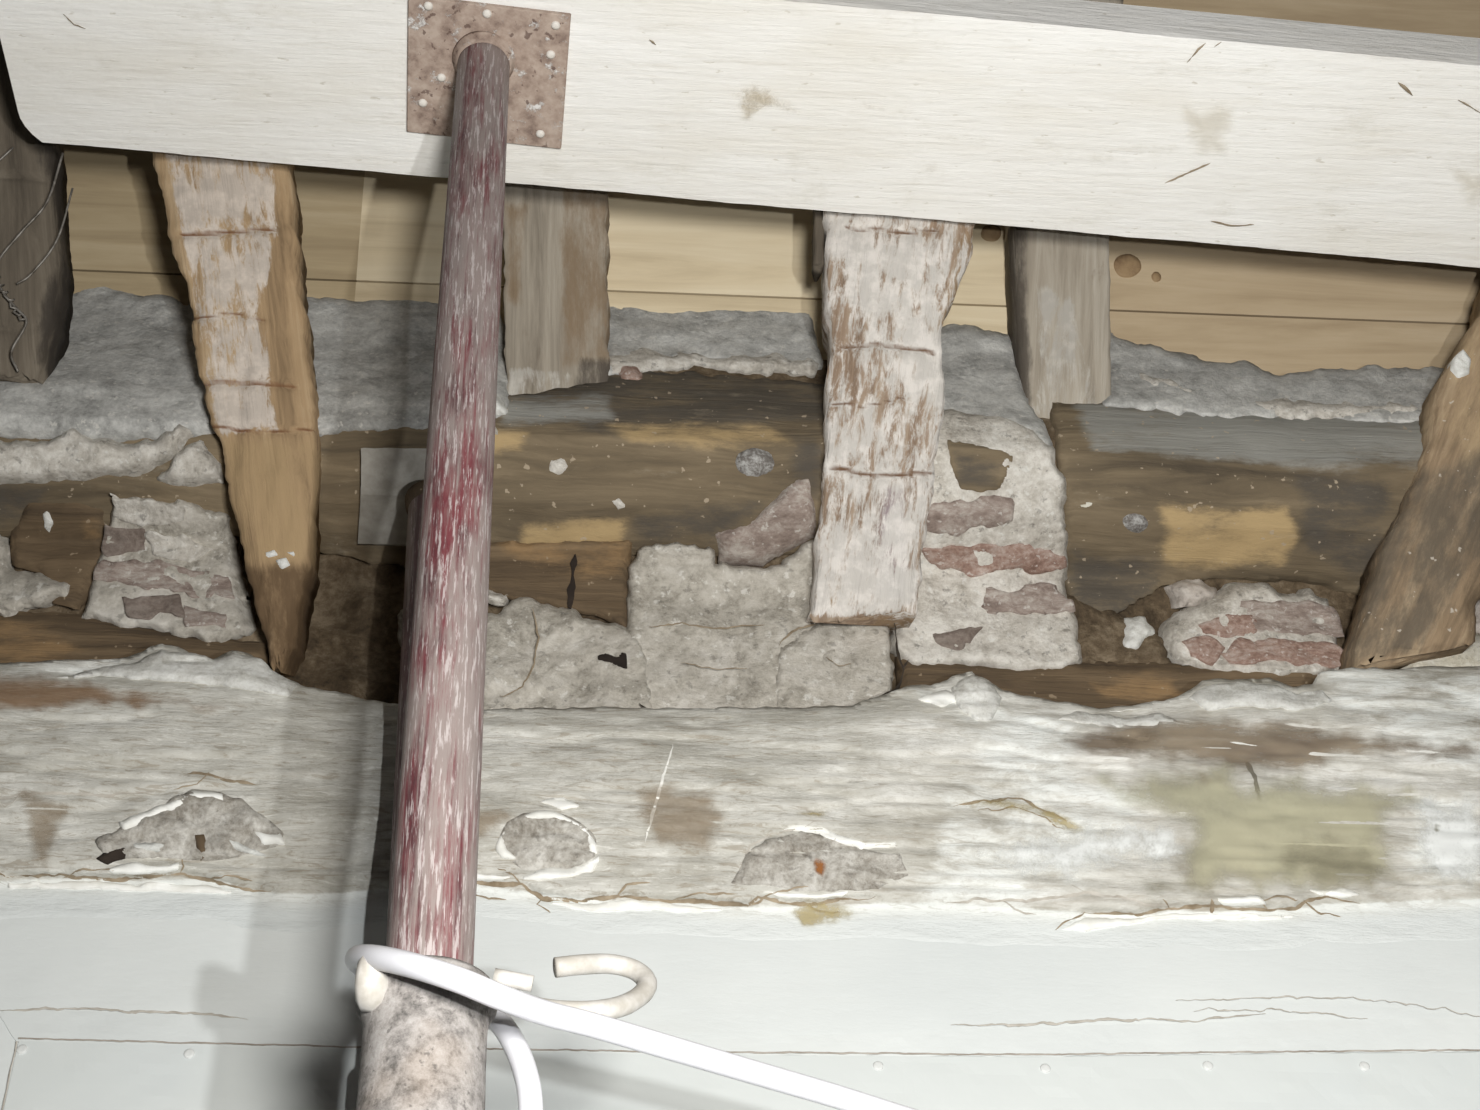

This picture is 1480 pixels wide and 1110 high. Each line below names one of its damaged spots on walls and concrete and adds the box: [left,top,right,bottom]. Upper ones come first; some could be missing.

crack [0,859,271,894]
flaking render [95,789,285,865]
flaking render [496,797,599,880]
flaking render [731,831,908,892]
crack [946,885,1360,932]
leakage [1000,721,1415,886]
leakage [1422,799,1480,878]